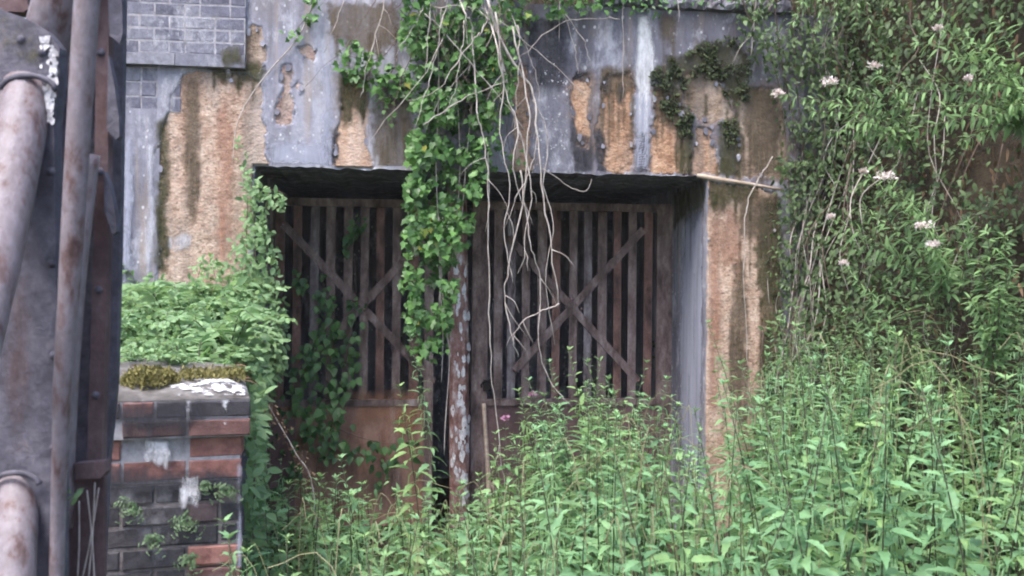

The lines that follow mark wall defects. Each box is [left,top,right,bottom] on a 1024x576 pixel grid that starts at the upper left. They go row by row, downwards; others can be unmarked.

peeling [39,35,58,125]
leakage [147,119,186,271]
leakage [165,76,199,217]
spalling [158,64,304,290]
spalling [333,99,373,167]
spalling [569,72,636,174]
leakage [601,16,691,168]
peeling [450,255,471,506]
spalling [648,68,790,541]